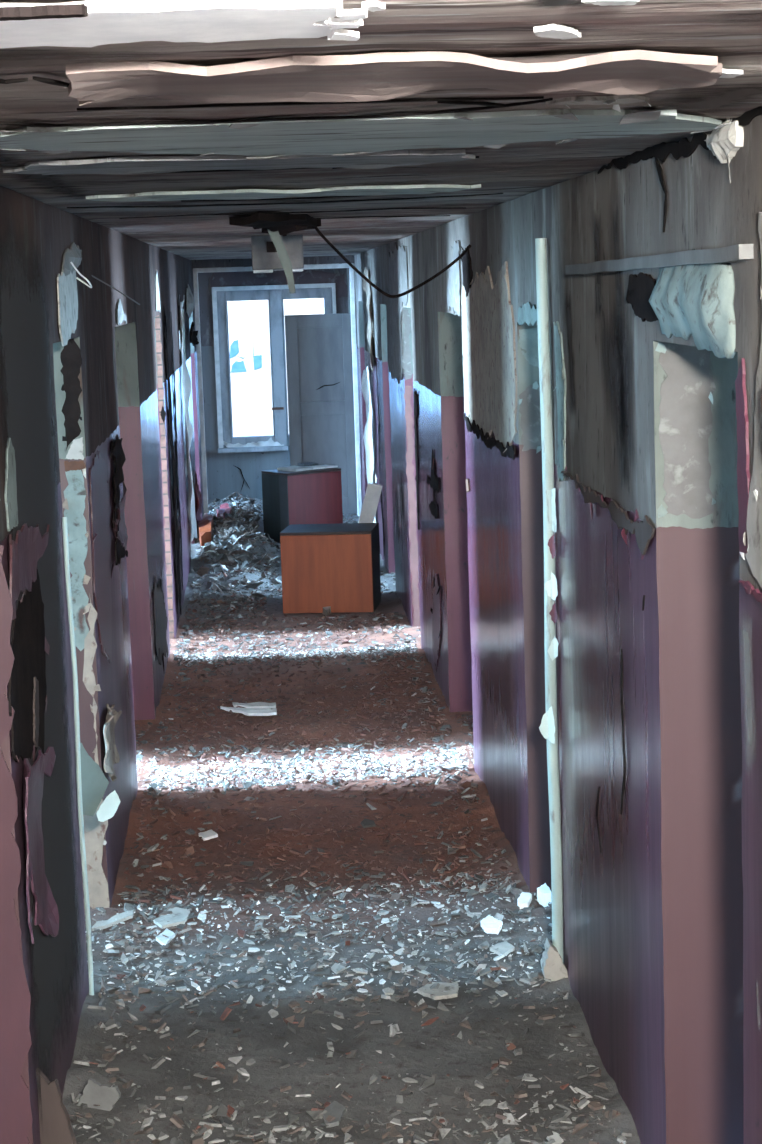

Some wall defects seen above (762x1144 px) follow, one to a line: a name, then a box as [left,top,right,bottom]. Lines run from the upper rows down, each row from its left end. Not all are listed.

crack [0,76,553,127]
peeling [57,242,128,909]
peeling [446,240,716,661]
peeling [735,324,762,605]
peeling [0,438,59,1144]